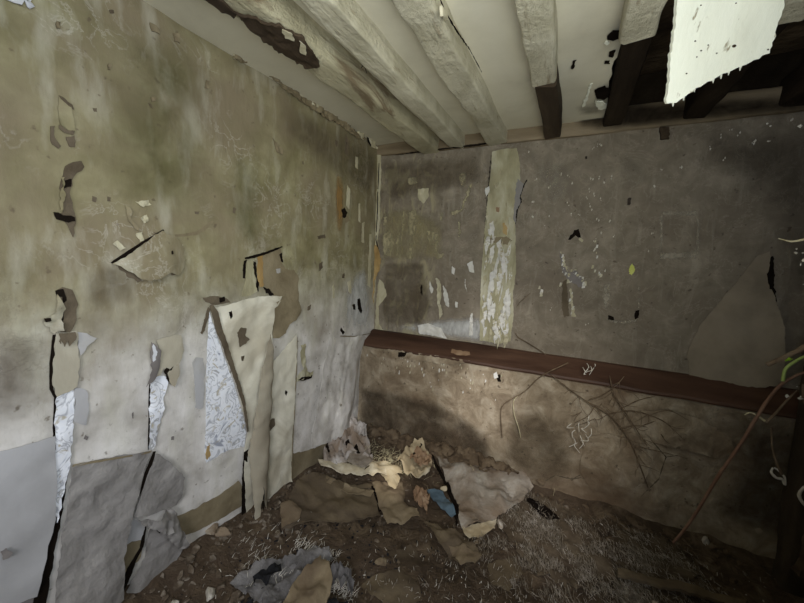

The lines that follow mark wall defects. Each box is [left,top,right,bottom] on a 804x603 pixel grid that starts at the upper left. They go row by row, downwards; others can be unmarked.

spalling [237,12,320,69]
spalling [269,76,378,149]
peeling [125,200,151,242]
spalling [203,296,231,305]
peeling [418,278,458,339]
leakage [433,321,480,338]
peeling [469,215,513,348]